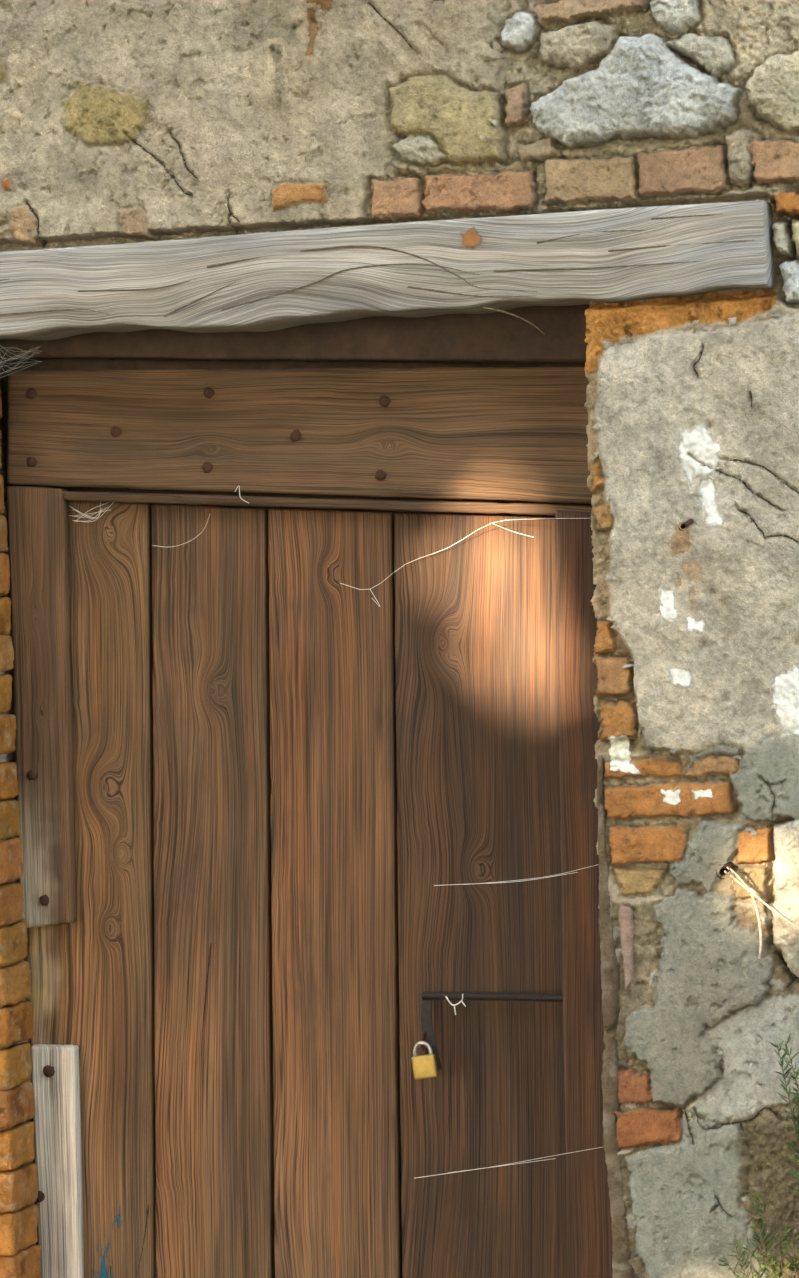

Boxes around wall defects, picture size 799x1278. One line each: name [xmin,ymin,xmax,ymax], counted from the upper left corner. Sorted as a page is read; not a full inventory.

spalling [364,178,374,218]
spalling [392,0,799,904]
crack [694,458,799,544]